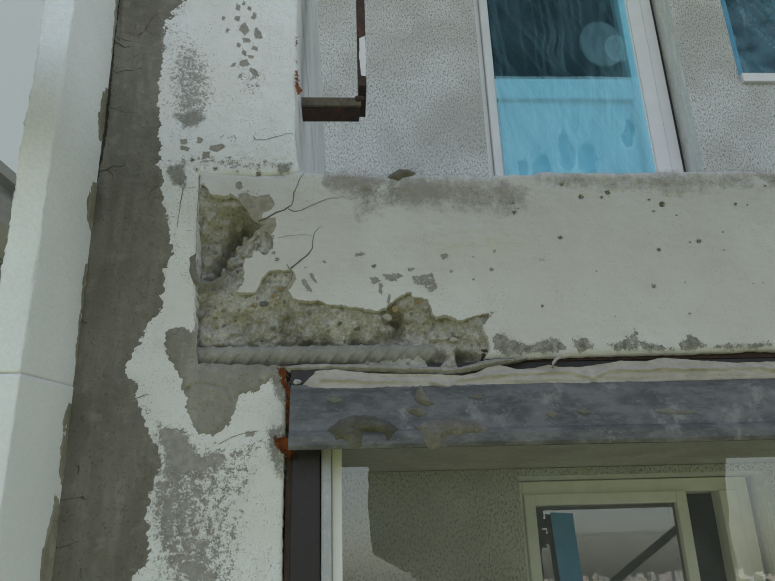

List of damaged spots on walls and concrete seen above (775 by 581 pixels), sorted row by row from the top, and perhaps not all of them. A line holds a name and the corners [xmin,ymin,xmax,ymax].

peeling [222,1,263,96]
crack [258,173,329,222]
crack [278,226,321,278]
spalling [138,136,594,581]
spalling [607,331,706,351]
corrosion [277,367,290,425]
corrosion [274,435,296,458]